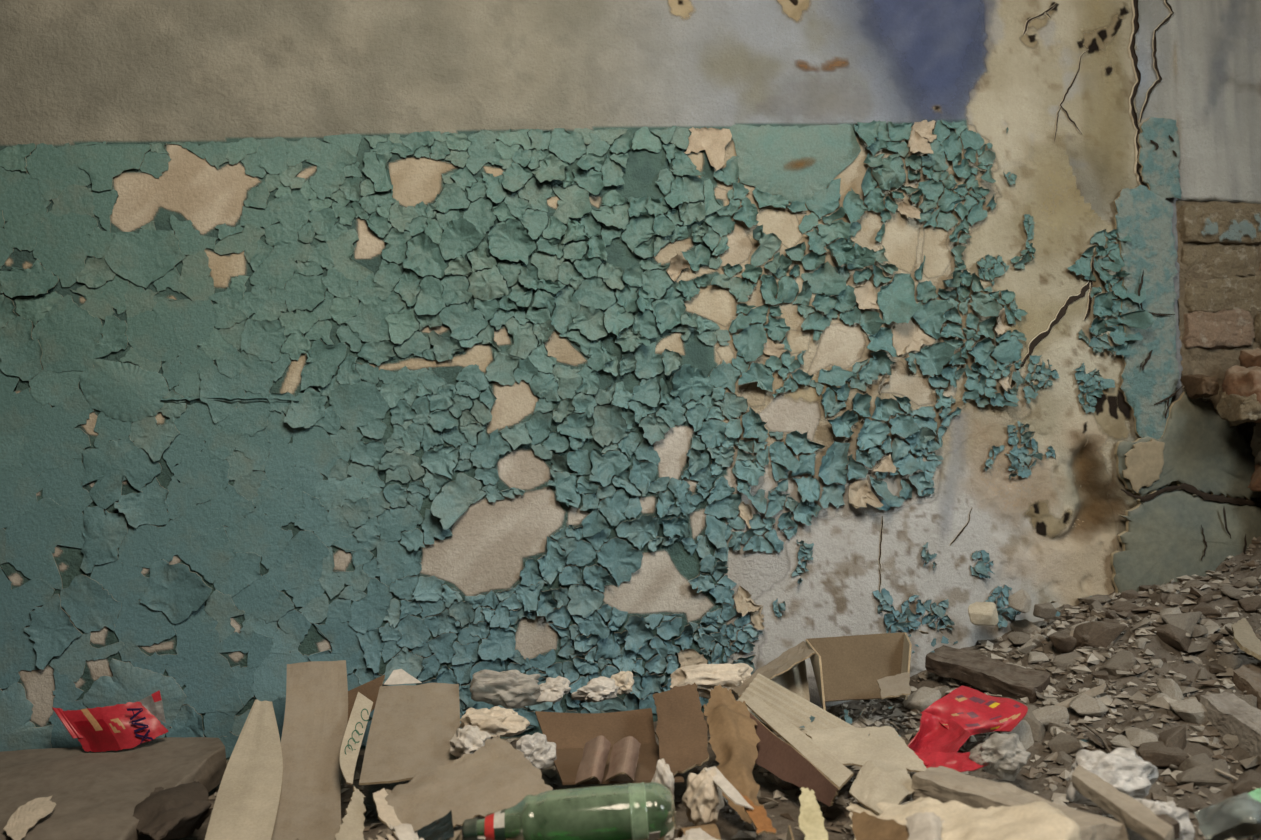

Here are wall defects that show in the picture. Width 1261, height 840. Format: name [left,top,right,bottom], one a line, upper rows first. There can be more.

damp [797,58,848,70]
crack [1053,49,1089,142]
crack [1128,0,1177,189]
flaking render [557,0,1261,714]
crack [1010,258,1094,386]
peeling [0,120,996,758]
crack [1121,483,1261,560]